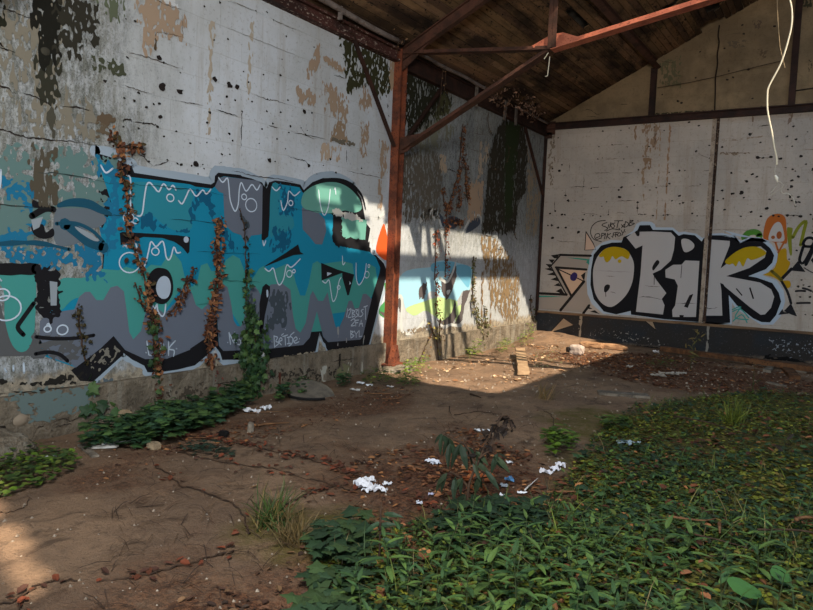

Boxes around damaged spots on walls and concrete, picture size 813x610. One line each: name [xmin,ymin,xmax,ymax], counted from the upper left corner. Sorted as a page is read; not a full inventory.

water stain [93,0,126,24]
peeling [125,0,187,64]
water stain [0,0,97,142]
peeling [296,43,349,166]
peeling [359,121,369,158]
peeling [378,139,389,209]